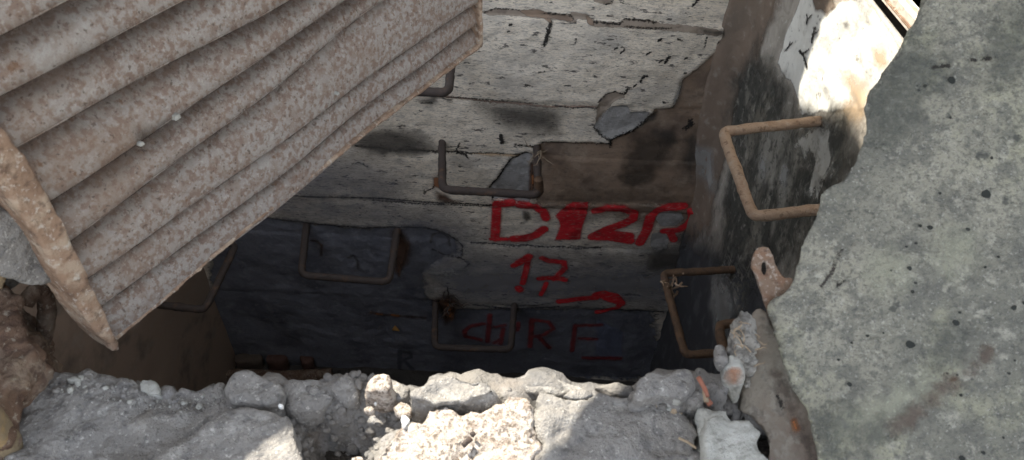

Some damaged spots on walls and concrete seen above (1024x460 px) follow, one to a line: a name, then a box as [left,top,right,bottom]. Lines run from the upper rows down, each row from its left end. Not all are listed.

peeling [482,0,776,252]
peeling [778,0,900,120]